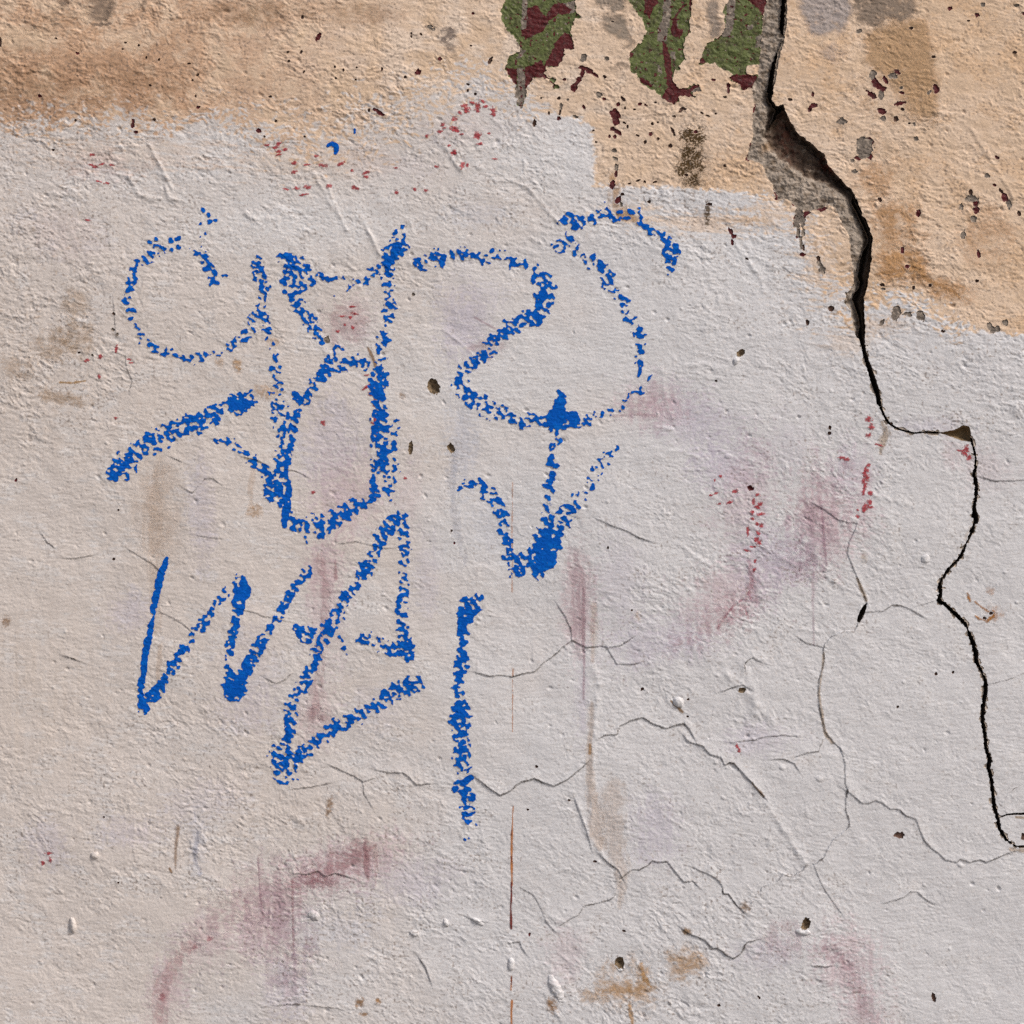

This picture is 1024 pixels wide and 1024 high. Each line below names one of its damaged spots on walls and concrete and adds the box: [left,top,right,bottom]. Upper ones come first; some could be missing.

peeling [801,0,915,34]
peeling [500,0,607,120]
crack [766,0,787,128]
peeling [592,0,702,207]
peeling [865,69,919,141]
spalling [699,0,886,343]
peeling [959,189,980,239]
peeling [984,173,1021,216]
peeling [879,303,925,326]
peeling [987,319,1008,333]
crack [851,196,1024,849]